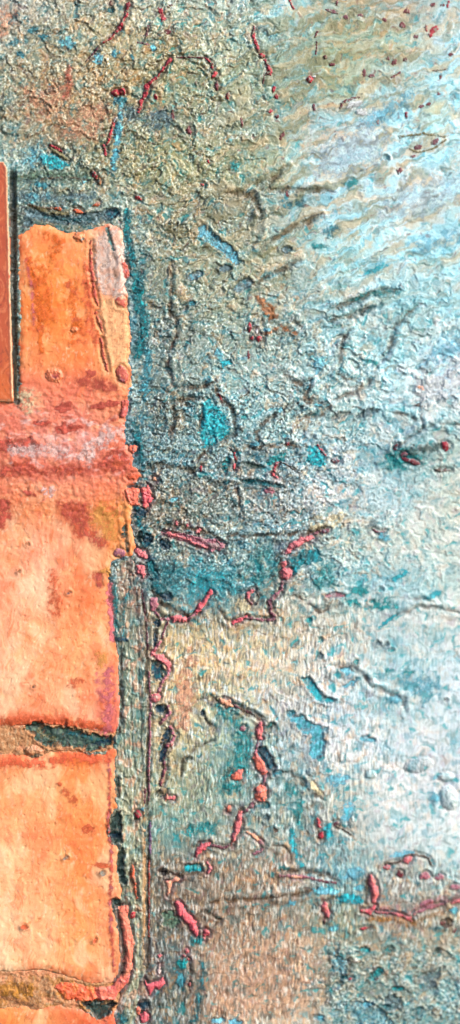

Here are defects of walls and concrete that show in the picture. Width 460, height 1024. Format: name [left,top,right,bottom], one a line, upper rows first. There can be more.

spalling [10,172,129,386]
peeling [119,400,129,418]
peeling [125,473,157,516]
spalling [26,721,112,752]